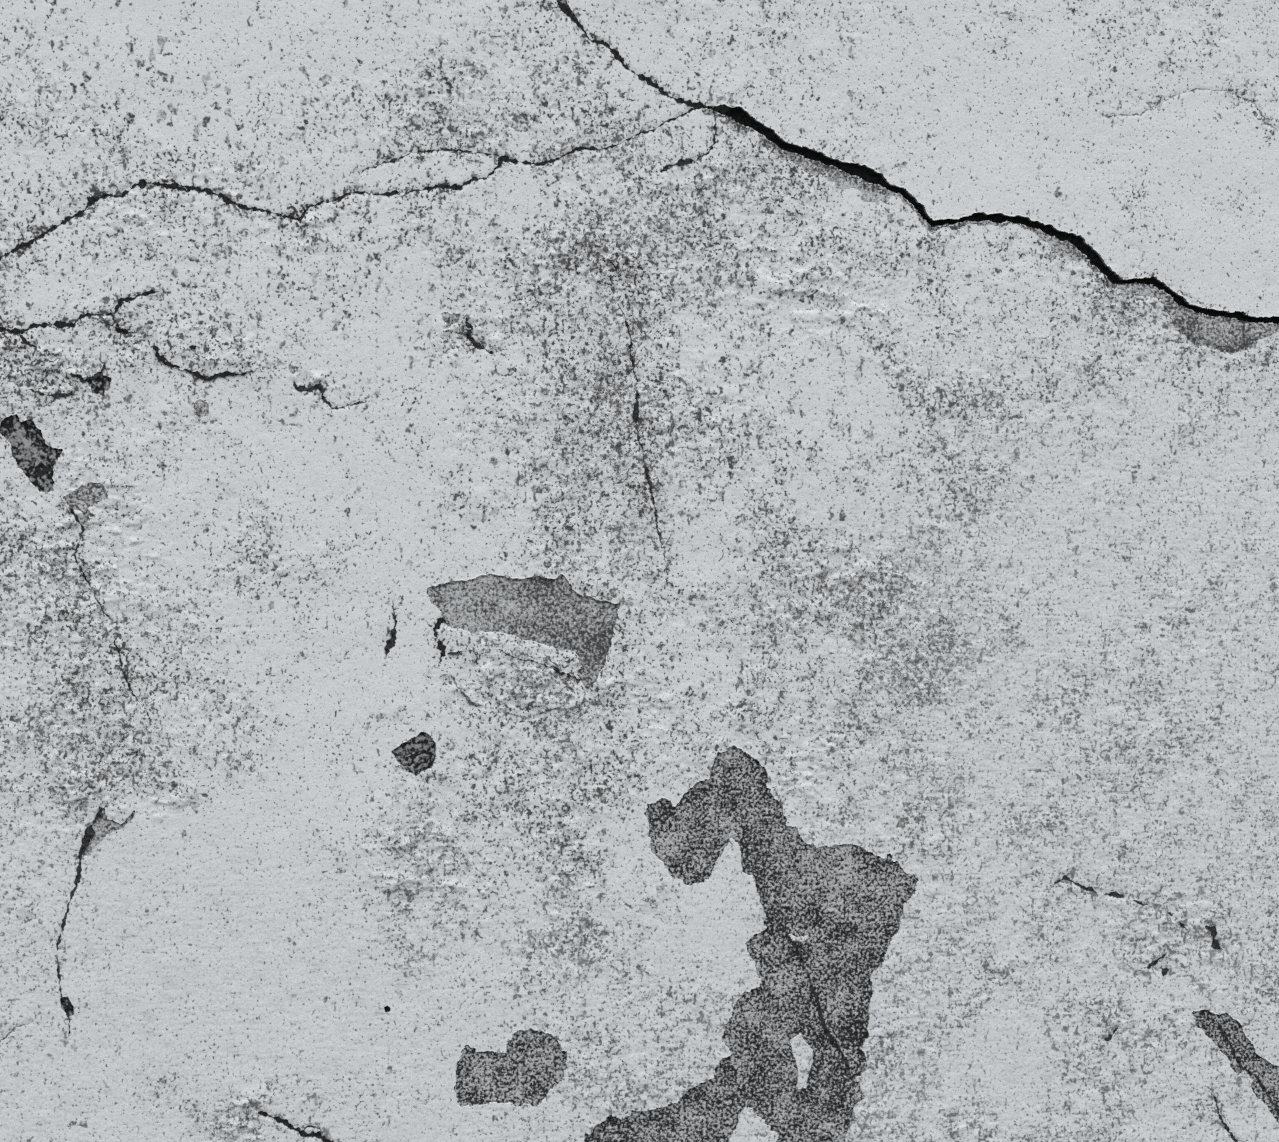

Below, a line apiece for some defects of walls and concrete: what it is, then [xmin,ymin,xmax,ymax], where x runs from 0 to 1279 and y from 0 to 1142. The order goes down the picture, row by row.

crack [0,0,1279,333]
crack [0,290,158,348]
crack [465,317,494,354]
spalling [0,416,14,428]
crack [293,381,365,409]
spalling [35,463,48,475]
spalling [427,574,620,689]
crack [56,809,102,1036]
spalling [584,745,918,1142]
spalling [454,1028,567,1107]
spalling [1192,1010,1279,1123]
crack [258,1111,334,1142]